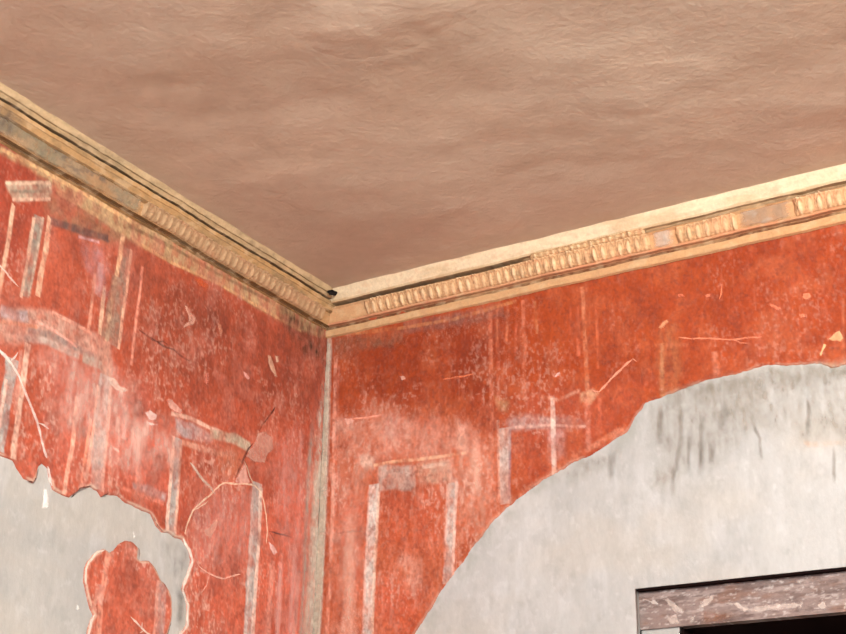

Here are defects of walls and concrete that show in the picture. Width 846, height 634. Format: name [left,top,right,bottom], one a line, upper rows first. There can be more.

flaking render [0,456,193,634]
crack [189,462,286,543]
flaking render [415,345,846,634]